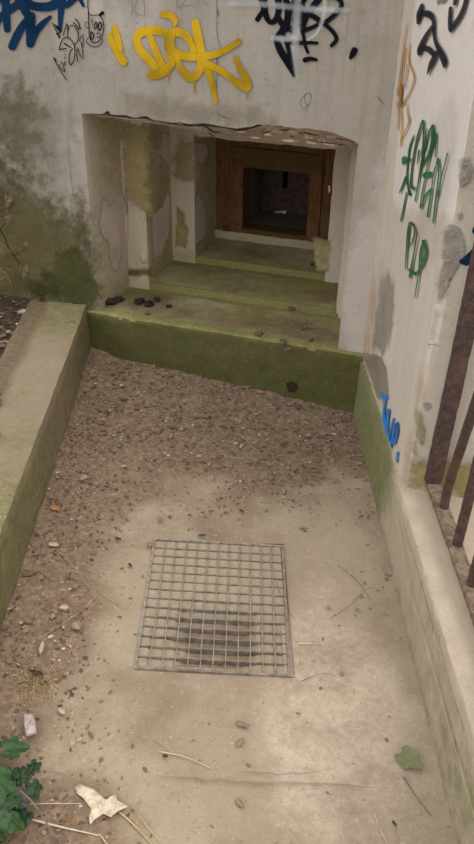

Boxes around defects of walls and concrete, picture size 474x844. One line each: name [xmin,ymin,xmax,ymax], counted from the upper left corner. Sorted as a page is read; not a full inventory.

water stain [0,82,46,177]
spalling [92,114,358,247]
spalling [437,214,465,299]